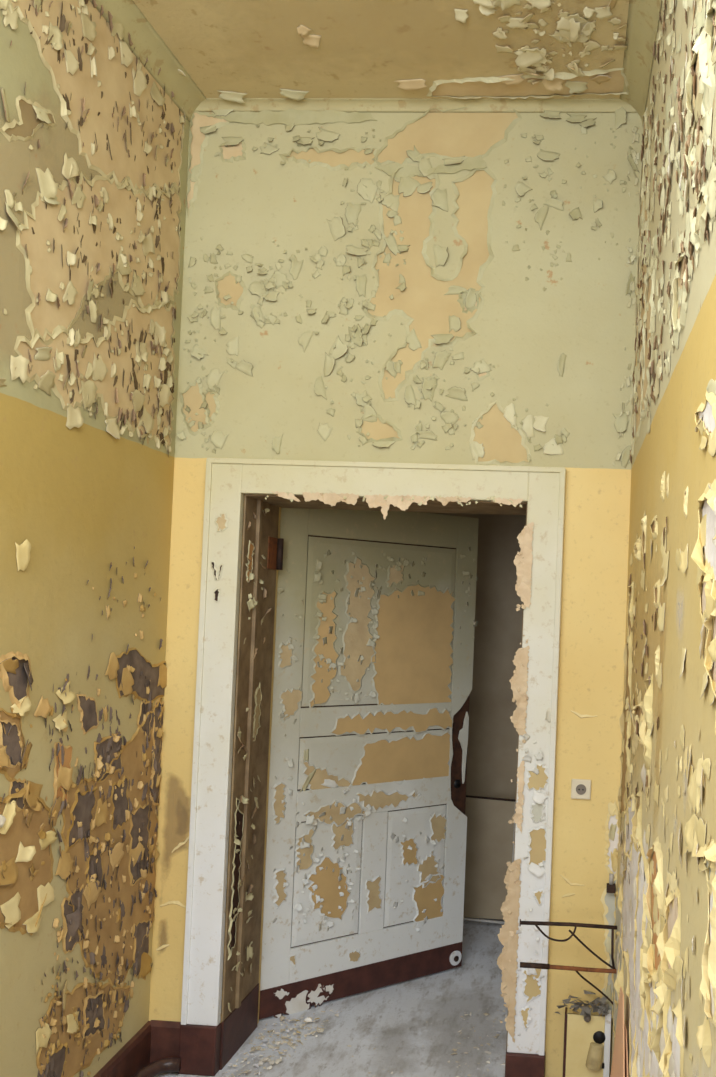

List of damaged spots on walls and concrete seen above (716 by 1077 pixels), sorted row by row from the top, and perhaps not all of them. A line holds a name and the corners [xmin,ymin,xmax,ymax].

peeling [0,0,716,468]
peeling [15,539,31,571]
peeling [513,522,534,611]
peeling [660,471,669,502]
peeling [0,546,167,1077]
peeling [227,775,261,976]
peeling [237,683,262,760]
peeling [347,949,361,964]
peeling [243,491,525,932]
peeling [497,635,549,1046]